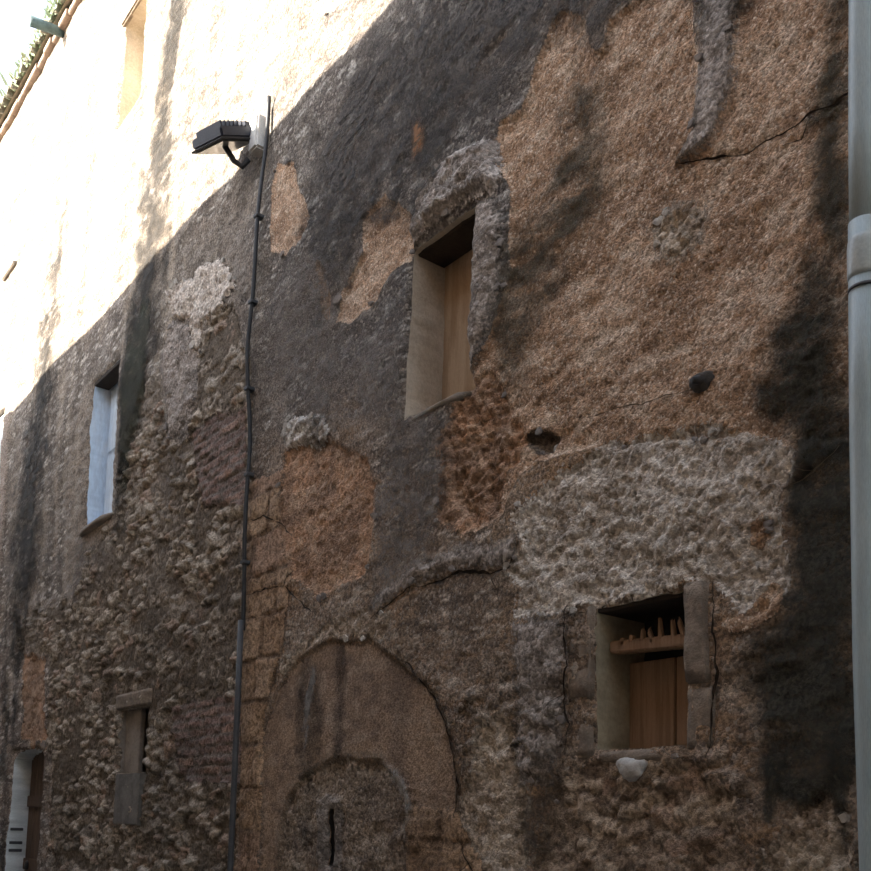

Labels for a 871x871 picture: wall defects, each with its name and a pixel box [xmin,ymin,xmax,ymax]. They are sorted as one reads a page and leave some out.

water stain [46,200,67,287]
flaking render [270,159,310,258]
flaking render [316,194,415,324]
water stain [494,82,603,371]
flaking render [432,0,849,633]
crack [678,92,848,164]
water stain [0,299,59,783]
flaking render [275,412,378,602]
crack [371,548,516,619]
crack [394,654,459,817]
crack [545,605,570,752]
crack [705,584,727,758]